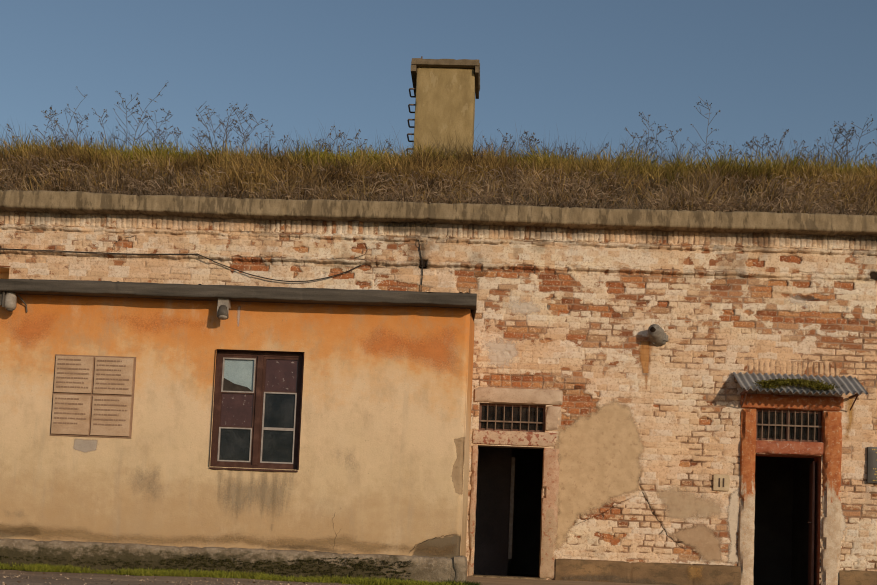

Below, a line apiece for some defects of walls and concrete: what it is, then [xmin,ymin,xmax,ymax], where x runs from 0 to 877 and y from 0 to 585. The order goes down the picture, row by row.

flaking render [452,437,465,494]
flaking render [573,502,621,525]
flaking render [594,532,626,546]
crack [573,477,683,547]